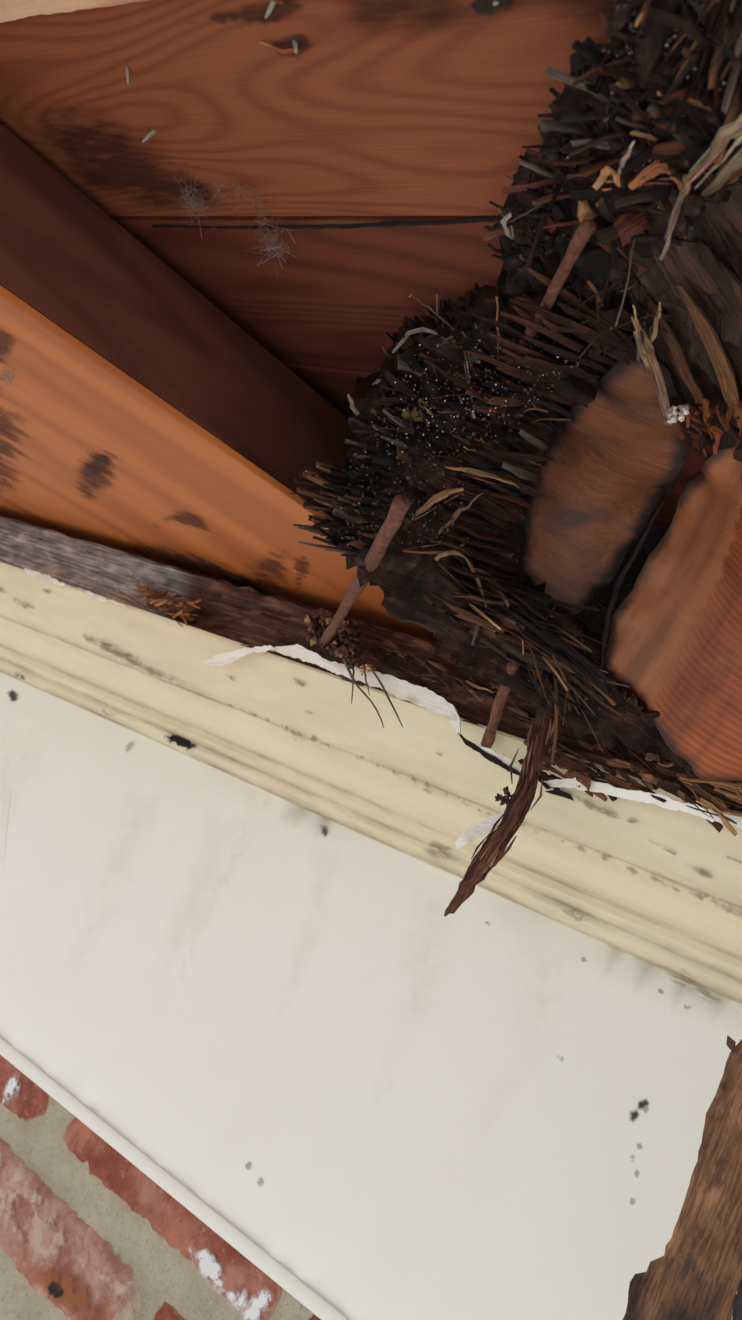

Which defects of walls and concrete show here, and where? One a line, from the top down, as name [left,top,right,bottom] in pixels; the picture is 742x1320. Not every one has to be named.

water stain [57,126,208,205]
water stain [0,331,12,362]
water stain [0,408,24,488]
water stain [78,455,113,497]
water stain [173,512,206,530]
water stain [135,546,308,596]
peeling [203,644,461,734]
peeling [477,745,522,772]
peeling [537,777,742,829]
peeling [455,812,504,850]